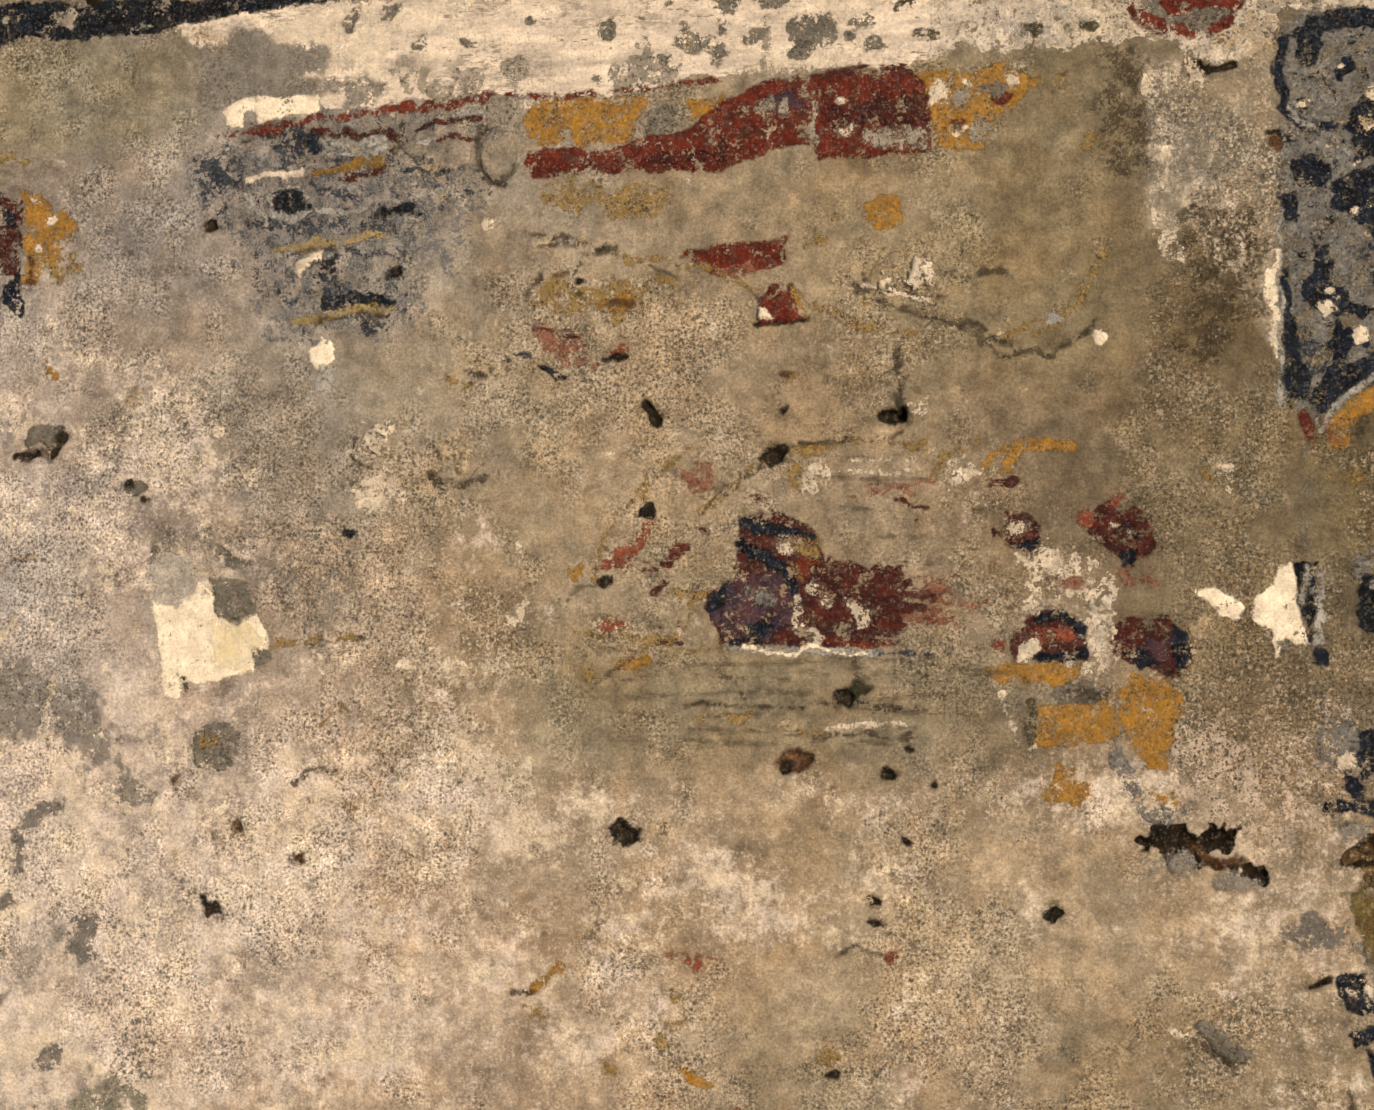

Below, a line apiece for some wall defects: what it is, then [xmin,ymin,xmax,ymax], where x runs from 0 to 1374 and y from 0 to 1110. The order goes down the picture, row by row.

peeling [39,0,101,37]
flaking render [1134,822,1270,893]
flaking render [1339,833,1374,890]